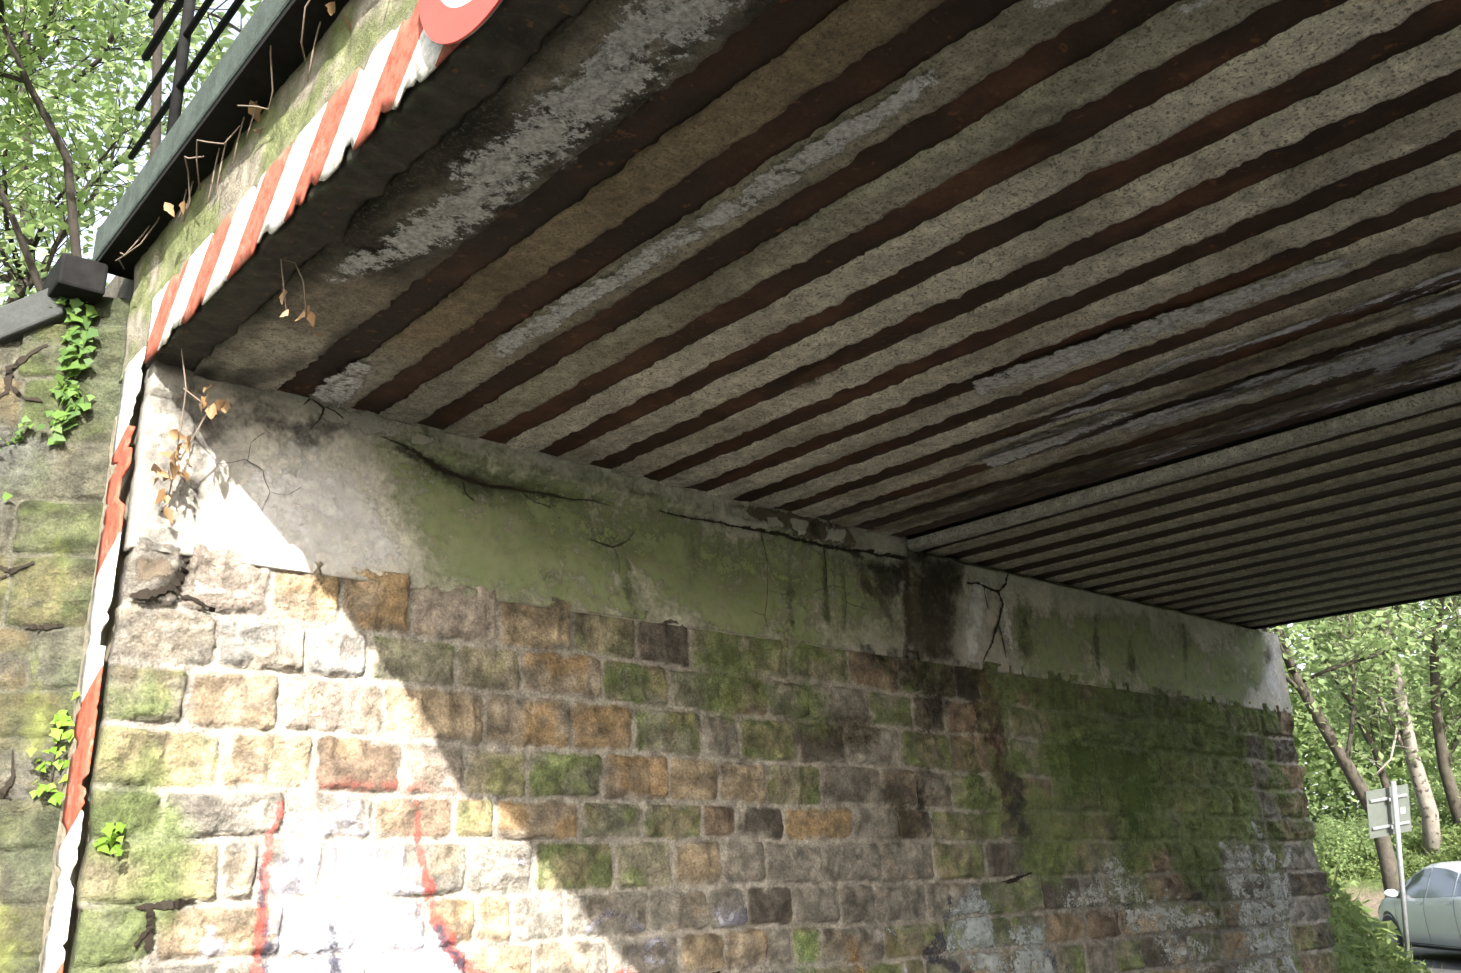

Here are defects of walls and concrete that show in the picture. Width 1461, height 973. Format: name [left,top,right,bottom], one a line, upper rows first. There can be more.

leakage [326,0,745,283]
leakage [481,69,940,359]
leakage [310,362,373,408]
leakage [909,259,1461,516]
crack [129,558,216,612]
crack [381,436,907,627]
leakage [852,548,1011,739]
crack [967,573,1009,663]
leakage [891,766,934,841]